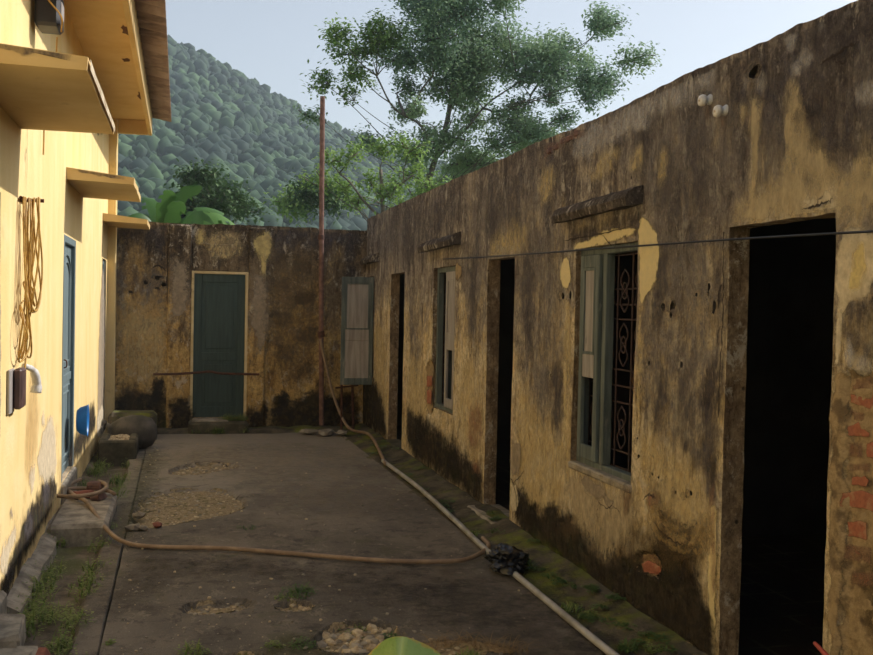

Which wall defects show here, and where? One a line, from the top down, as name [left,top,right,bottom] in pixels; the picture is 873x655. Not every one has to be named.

water stain [633,12,873,221]
water stain [1,476,57,596]
water stain [115,379,194,428]
water stain [406,408,482,502]
water stain [515,491,716,655]
flaking render [641,551,662,576]
water stain [645,233,723,499]
flaking render [827,369,873,655]